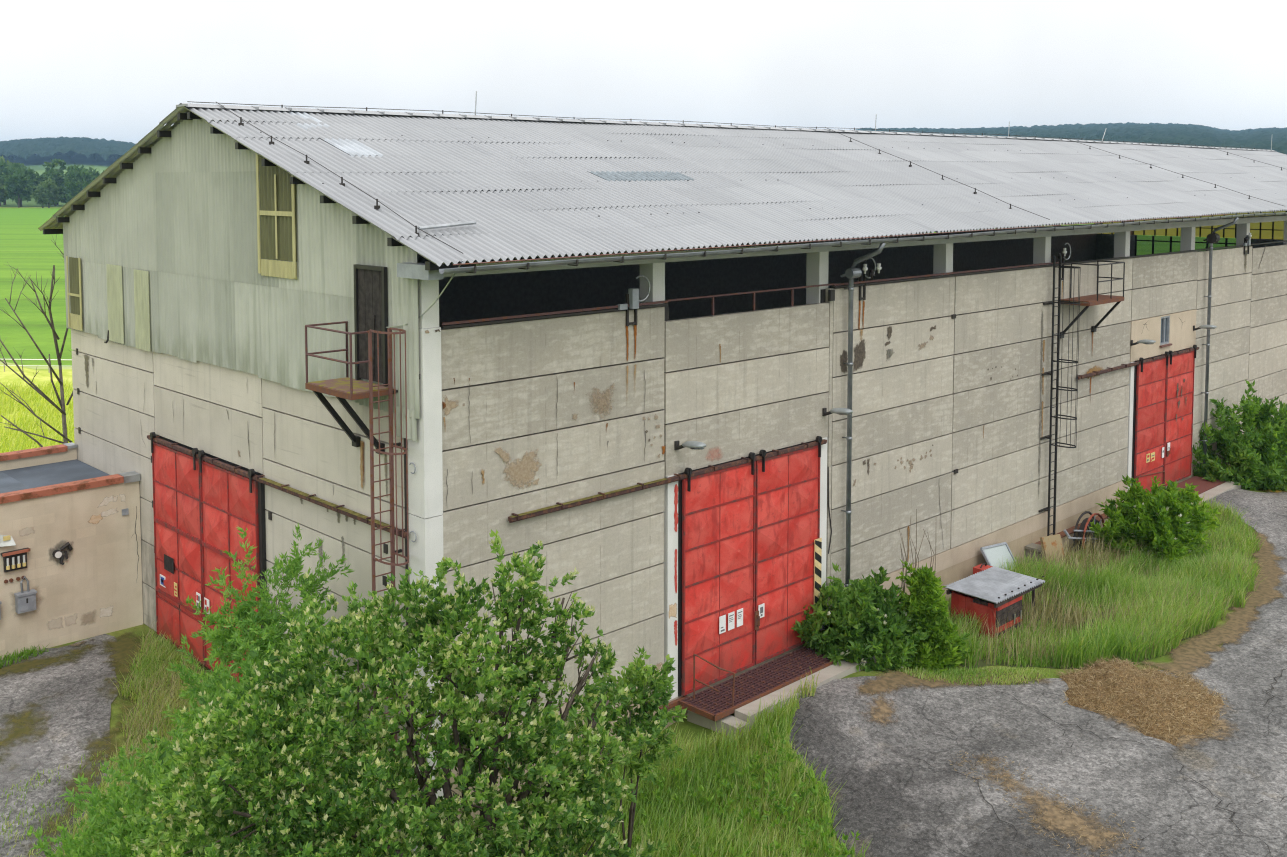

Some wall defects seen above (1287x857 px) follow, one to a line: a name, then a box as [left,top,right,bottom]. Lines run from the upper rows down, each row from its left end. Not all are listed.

rust [625,325,637,385]
leakage [840,339,866,373]
peeling [590,385,614,415]
peeling [495,448,542,487]